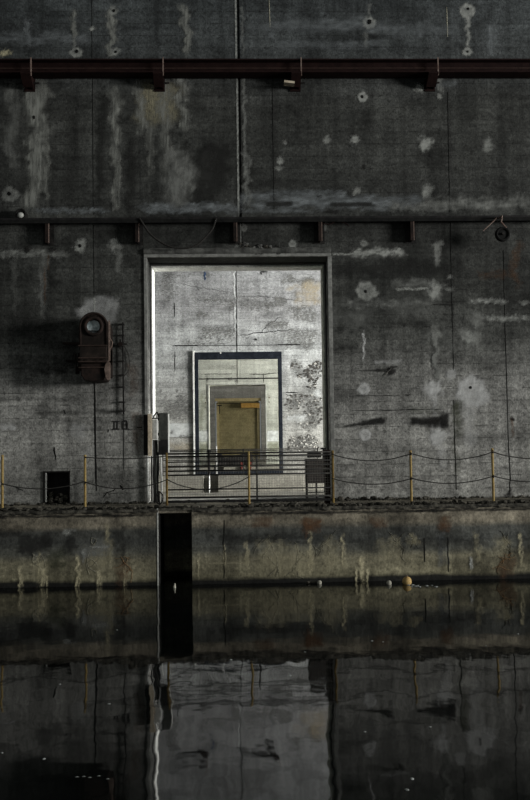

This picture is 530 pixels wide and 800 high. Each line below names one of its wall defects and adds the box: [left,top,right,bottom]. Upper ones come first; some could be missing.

leakage [2,86,53,212]
leakage [82,88,135,213]
leakage [149,78,253,213]
peeling [284,360,323,451]